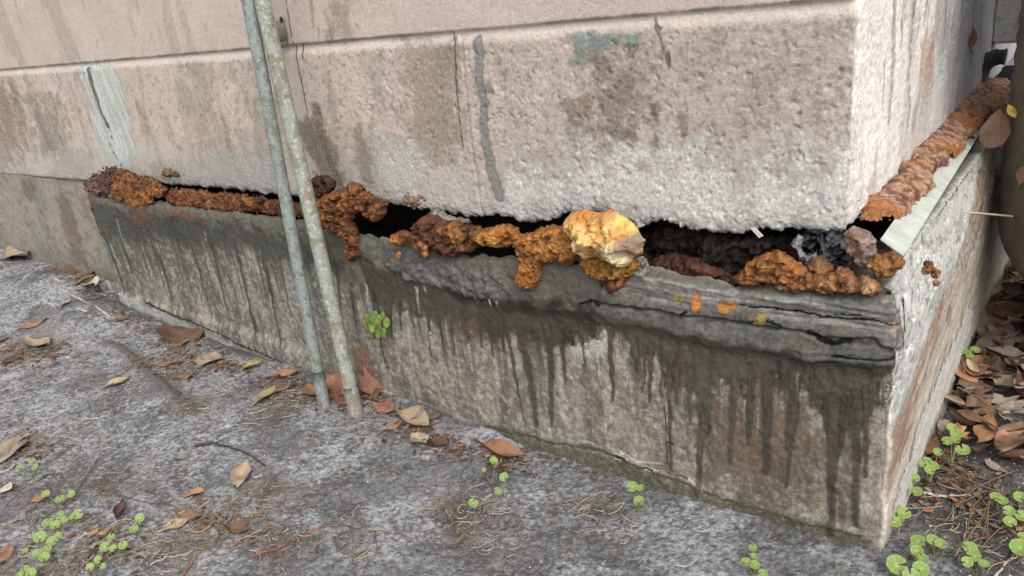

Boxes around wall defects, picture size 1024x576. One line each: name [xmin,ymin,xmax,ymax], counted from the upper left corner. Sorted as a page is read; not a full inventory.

crack [452,31,504,202]
spalling [675,222,737,234]
water stain [92,210,290,360]
crack [579,299,600,308]
rust [675,293,702,313]
rust [716,302,738,314]
crack [718,298,905,361]
water stain [328,256,892,536]